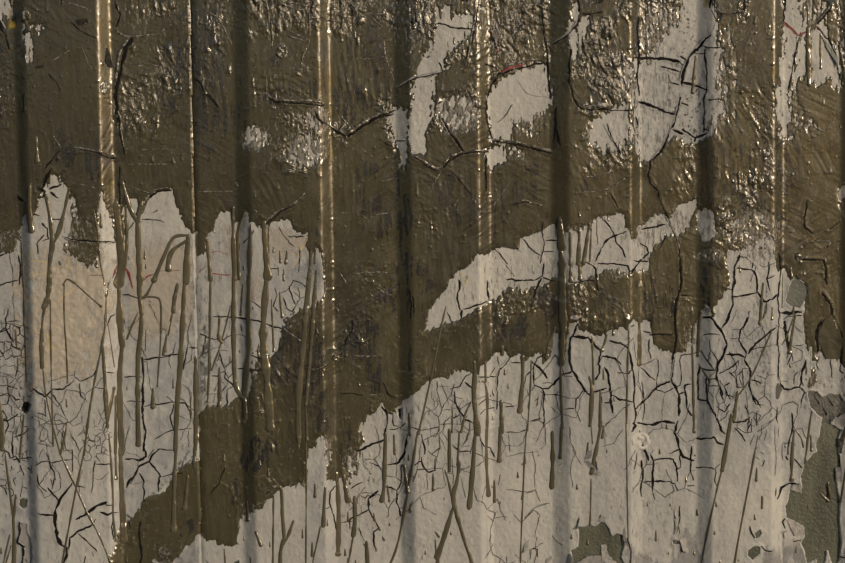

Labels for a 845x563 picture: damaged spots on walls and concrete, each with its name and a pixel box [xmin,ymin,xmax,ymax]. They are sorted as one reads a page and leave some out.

crack [0,0,233,286]
crack [0,309,21,342]
crack [4,166,308,563]
crack [265,0,845,563]
peeling [16,522,32,563]
peeling [567,515,658,563]
peeling [671,509,704,563]
peeling [748,391,845,563]